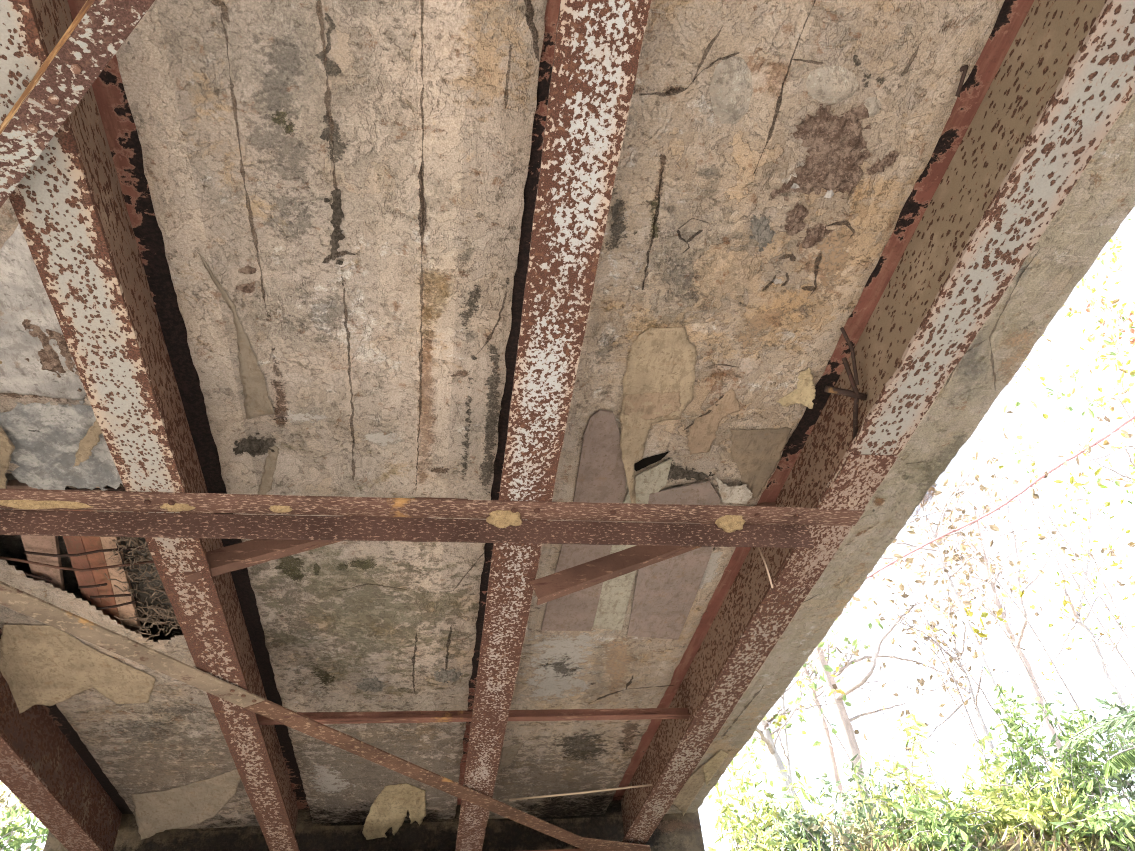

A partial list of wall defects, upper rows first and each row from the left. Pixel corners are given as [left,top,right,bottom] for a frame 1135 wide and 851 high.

crack [503,0,539,108]
crack [754,0,823,173]
crack [315,0,356,481]
crack [415,0,434,491]
peeling [0,224,125,491]
crack [471,278,509,360]
peeling [619,327,792,504]
peeling [776,367,816,409]
corrosion [997,327,1041,386]
spalling [0,544,154,582]
peeling [0,624,156,714]
peeling [131,769,241,840]